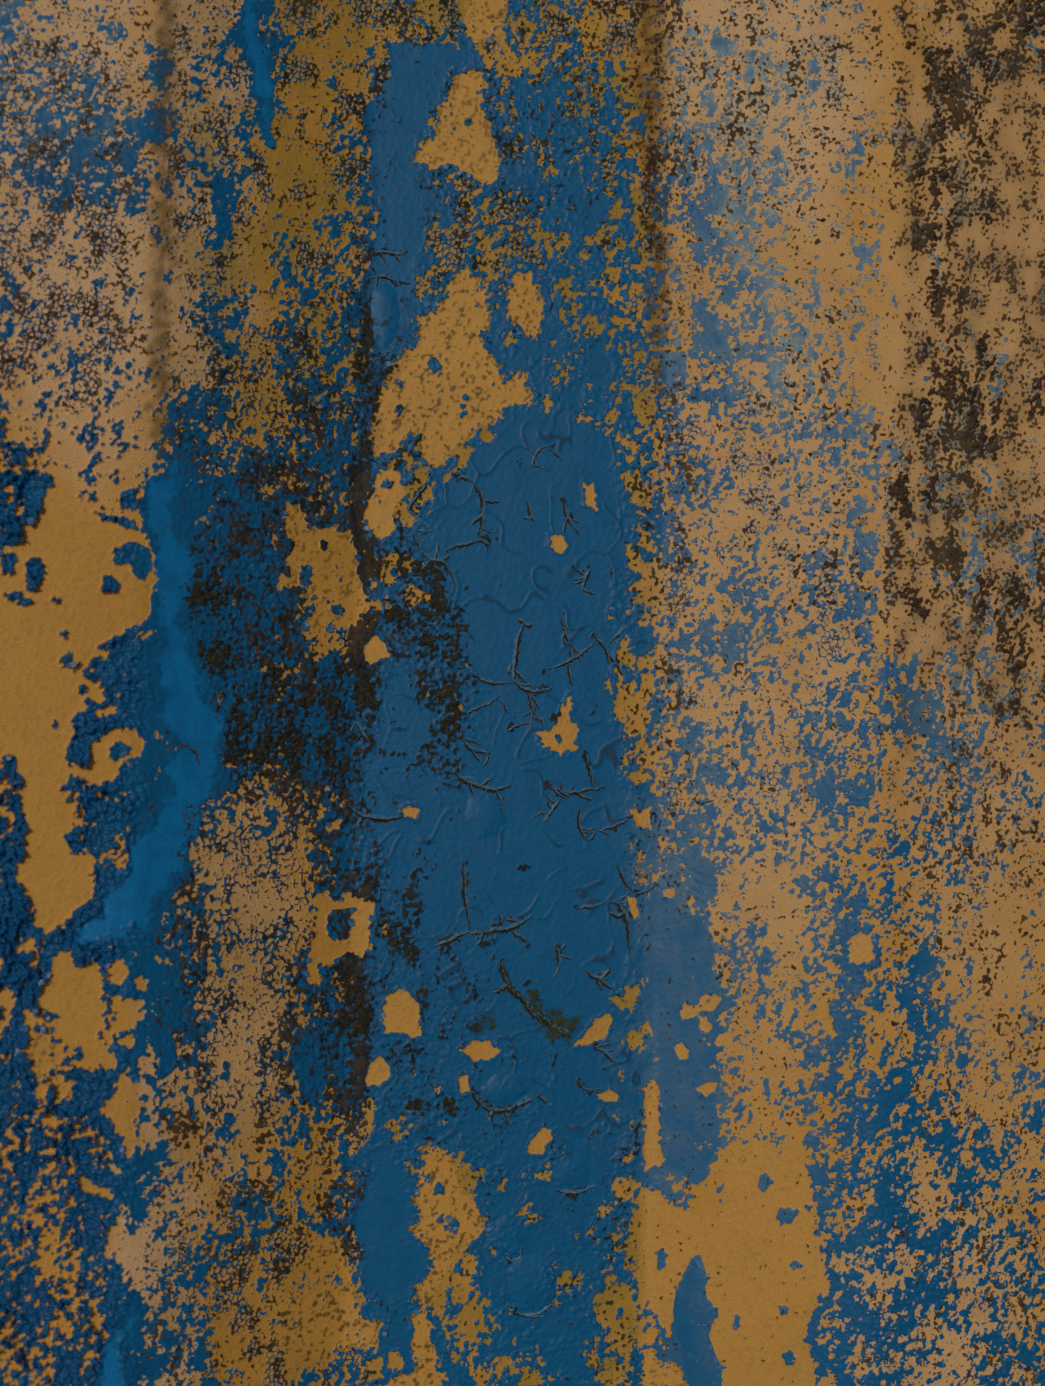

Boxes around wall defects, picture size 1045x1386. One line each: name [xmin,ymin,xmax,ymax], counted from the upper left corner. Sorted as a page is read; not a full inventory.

peeling [276,262,545,640]
crack [528,445,563,468]
peeling [0,487,158,934]
crack [346,802,400,825]
crack [407,475,658,1092]
peeling [301,892,377,987]
peeling [0,950,154,1158]
peeling [281,1231,387,1378]
peeling [375,1140,491,1386]
crack [469,1087,548,1128]
crack [555,1184,599,1197]
peeling [637,1080,831,1386]